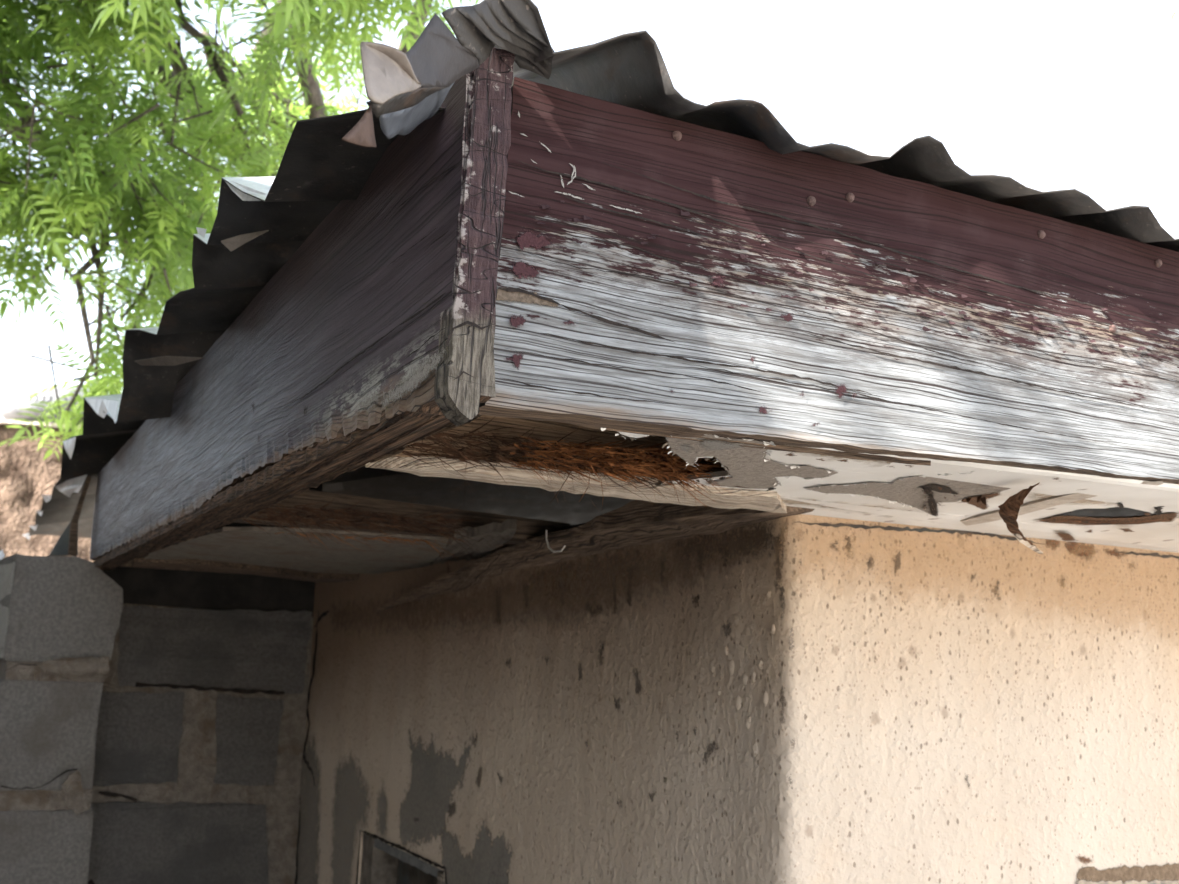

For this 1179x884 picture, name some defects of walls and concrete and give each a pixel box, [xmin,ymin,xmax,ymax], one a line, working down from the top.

peeling [511,163,594,280]
peeling [510,314,526,328]
peeling [883,290,983,335]
peeling [506,353,523,369]
peeling [836,384,857,399]
peeling [601,428,1010,516]
spalling [1056,529,1092,541]
leakage [333,521,782,626]
crack [135,610,329,786]
crack [98,791,137,802]
peeling [297,730,513,884]
crack [293,810,301,884]